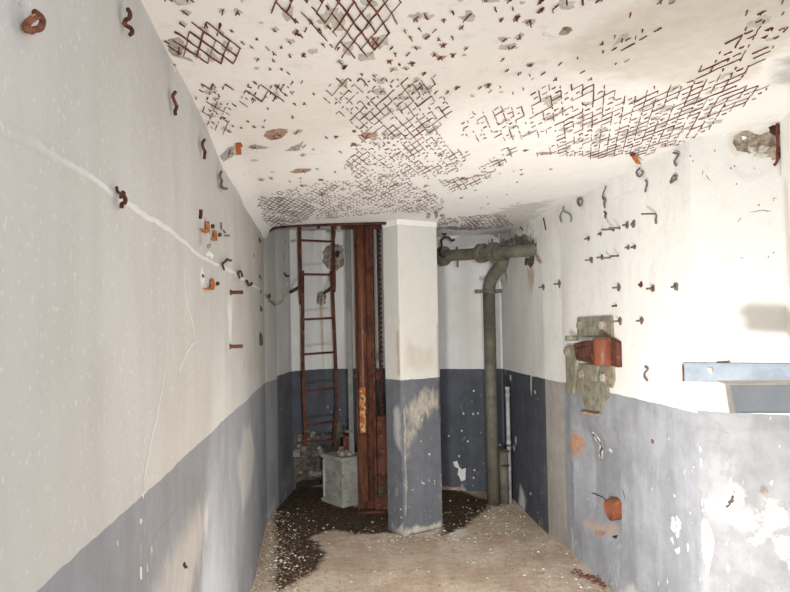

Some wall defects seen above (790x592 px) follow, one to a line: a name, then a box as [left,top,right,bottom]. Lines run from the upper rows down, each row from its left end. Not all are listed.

spalling [164,0,194,28]
spalling [450,0,475,30]
spalling [481,0,545,50]
spalling [163,26,233,62]
peeling [336,0,389,87]
peeling [372,60,416,95]
flaking render [519,0,790,177]
spalling [248,128,315,157]
spalling [350,130,414,156]
peeling [434,455,475,491]
peeling [138,462,214,592]
peeling [700,477,790,578]